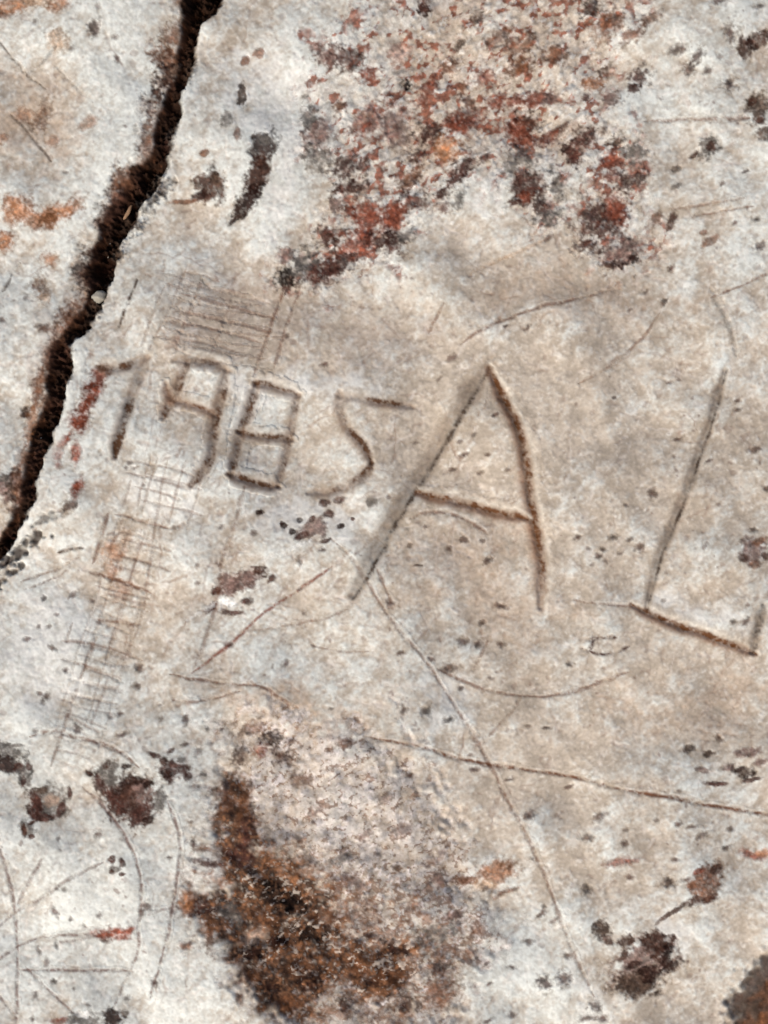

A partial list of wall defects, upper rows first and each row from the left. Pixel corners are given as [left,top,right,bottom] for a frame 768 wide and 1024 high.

crack [0,0,233,590]